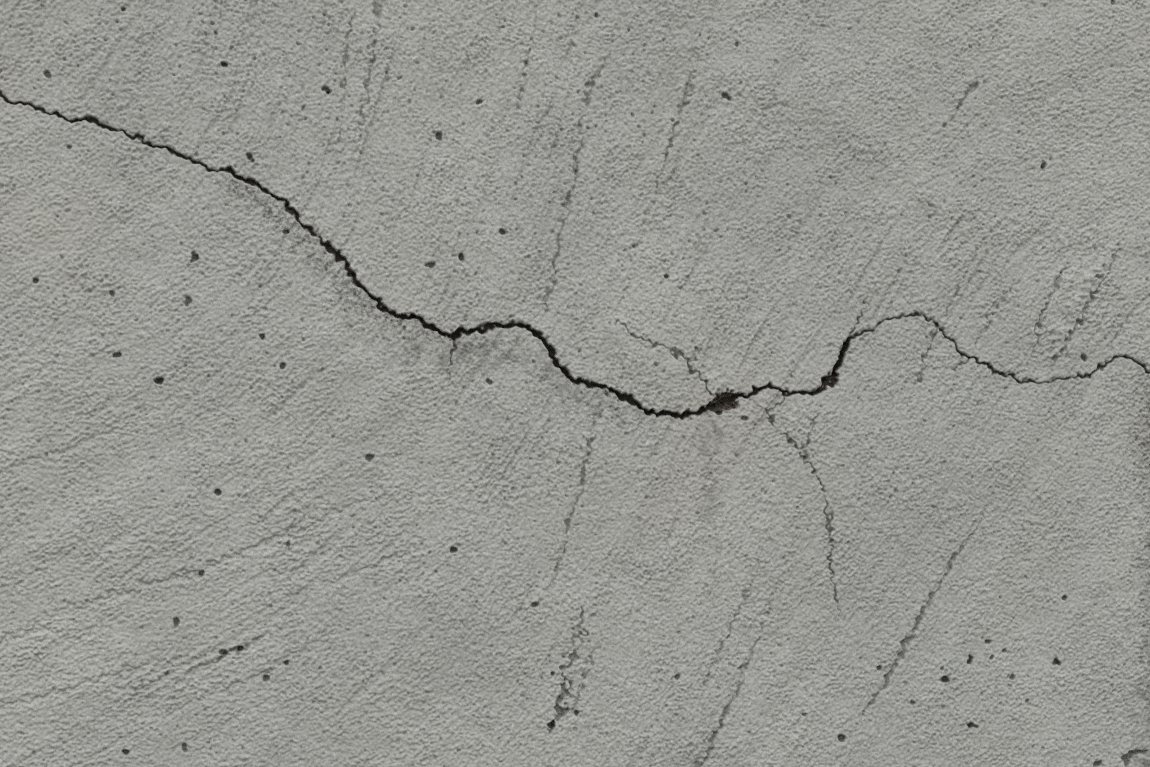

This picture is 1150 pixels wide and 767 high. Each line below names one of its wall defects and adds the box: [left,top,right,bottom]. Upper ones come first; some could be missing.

crack [0,91,1150,610]